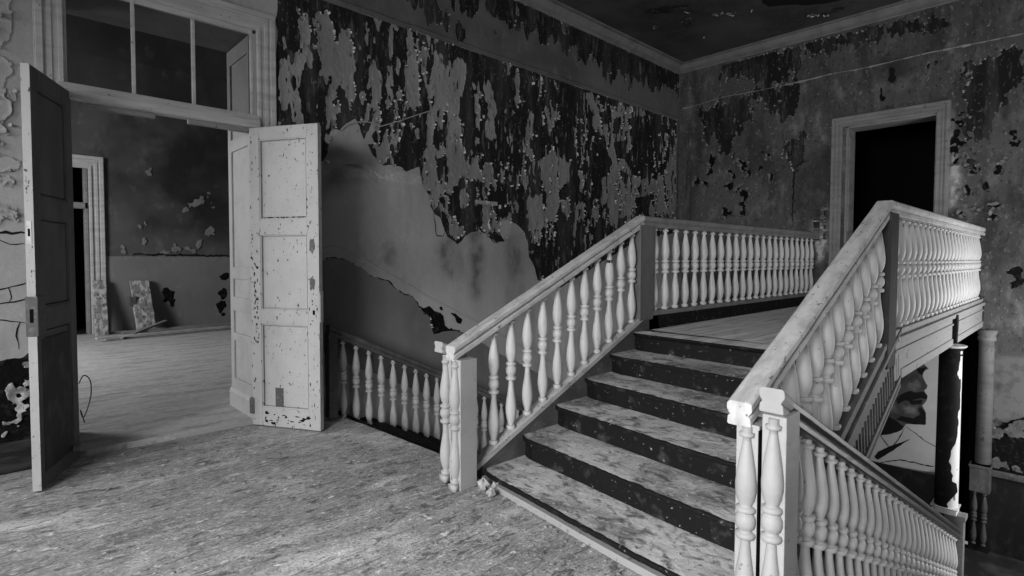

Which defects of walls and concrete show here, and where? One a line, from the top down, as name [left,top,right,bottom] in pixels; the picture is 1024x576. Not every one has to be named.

peeling [0,0,21,188]
peeling [276,0,680,287]
peeling [691,13,951,222]
peeling [949,43,1024,330]
crack [0,230,25,245]
crack [0,283,26,348]
spalling [162,287,175,307]
spalling [216,273,229,316]
spalling [398,289,462,334]
spalling [0,353,31,444]
peeling [265,403,316,427]
spalling [991,417,1024,476]